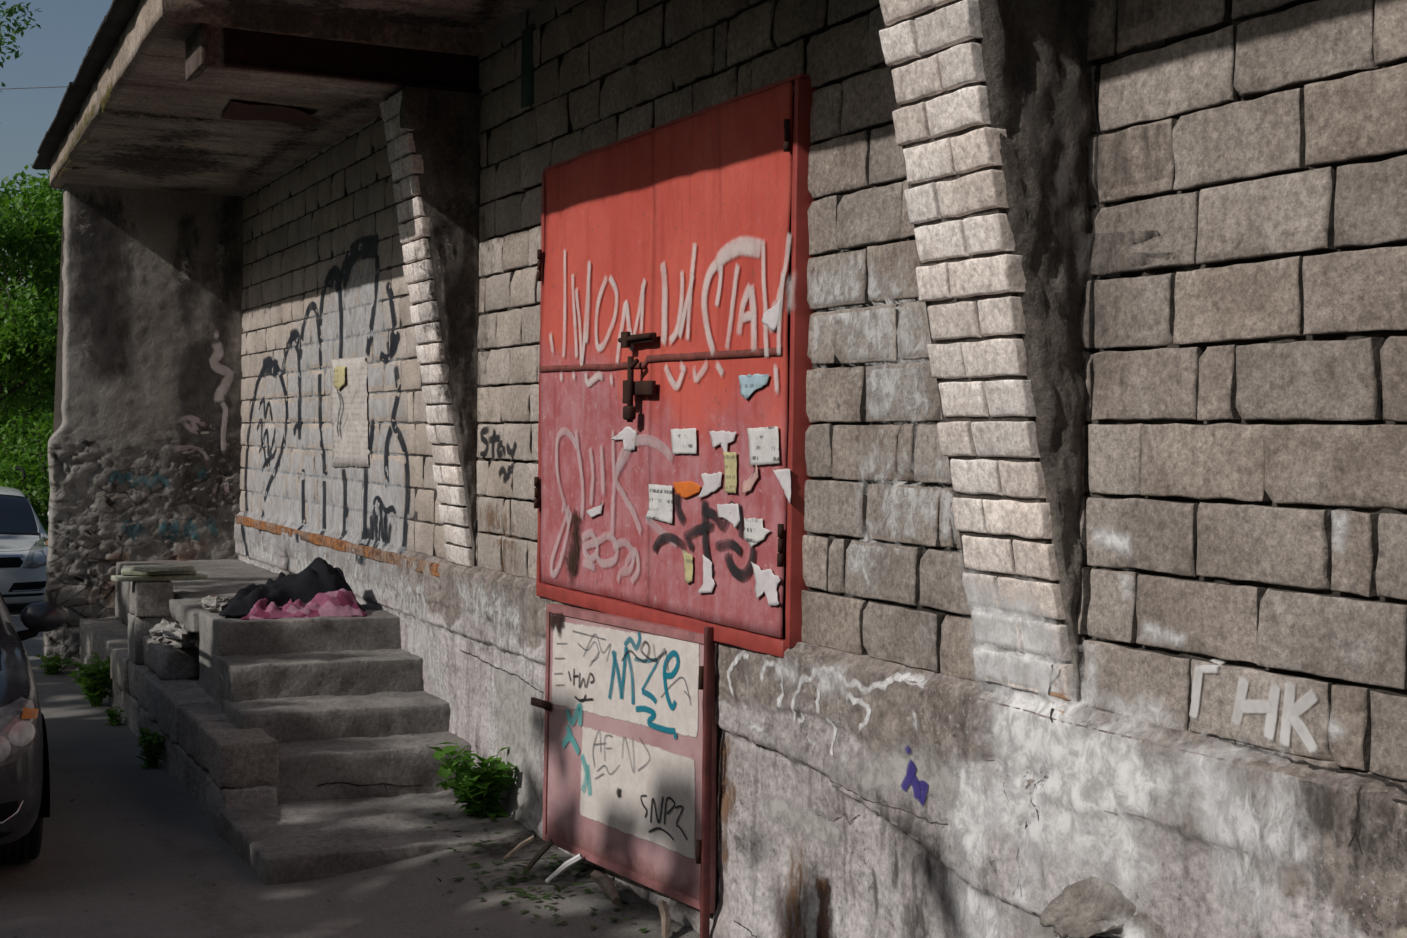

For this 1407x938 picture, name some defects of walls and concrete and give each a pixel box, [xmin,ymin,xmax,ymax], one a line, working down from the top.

water stain [223,0,502,44]
water stain [91,98,377,192]
water stain [809,259,928,432]
water stain [848,447,961,584]
water stain [1093,530,1129,553]
water stain [1333,515,1346,547]
water stain [727,652,927,756]
water stain [878,579,1407,938]
crack [1207,733,1407,854]
rust [781,857,832,938]